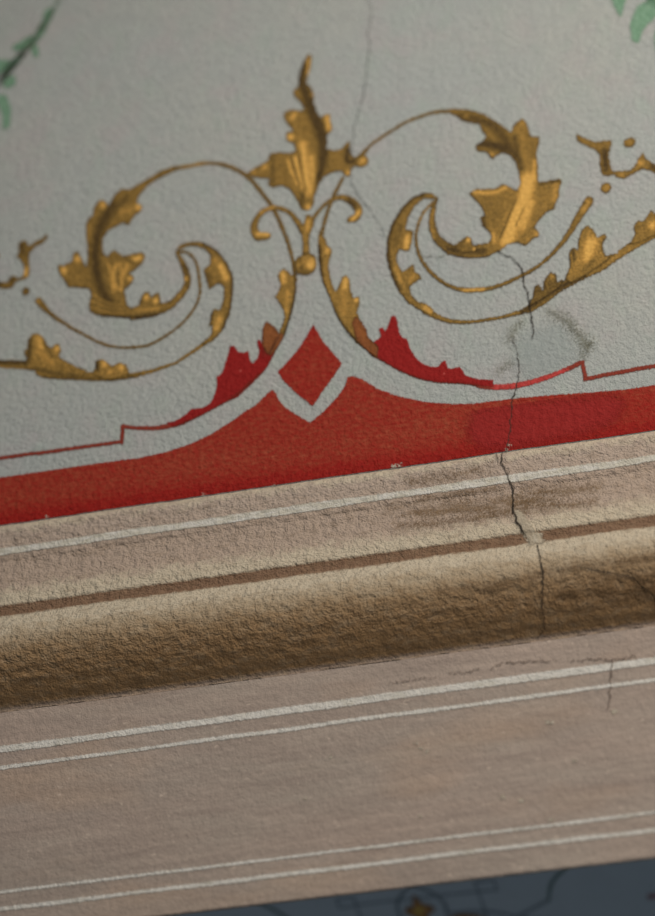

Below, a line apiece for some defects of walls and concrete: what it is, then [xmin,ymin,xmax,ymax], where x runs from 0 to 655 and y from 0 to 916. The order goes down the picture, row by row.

crack [496,251,545,637]
crack [571,655,635,709]